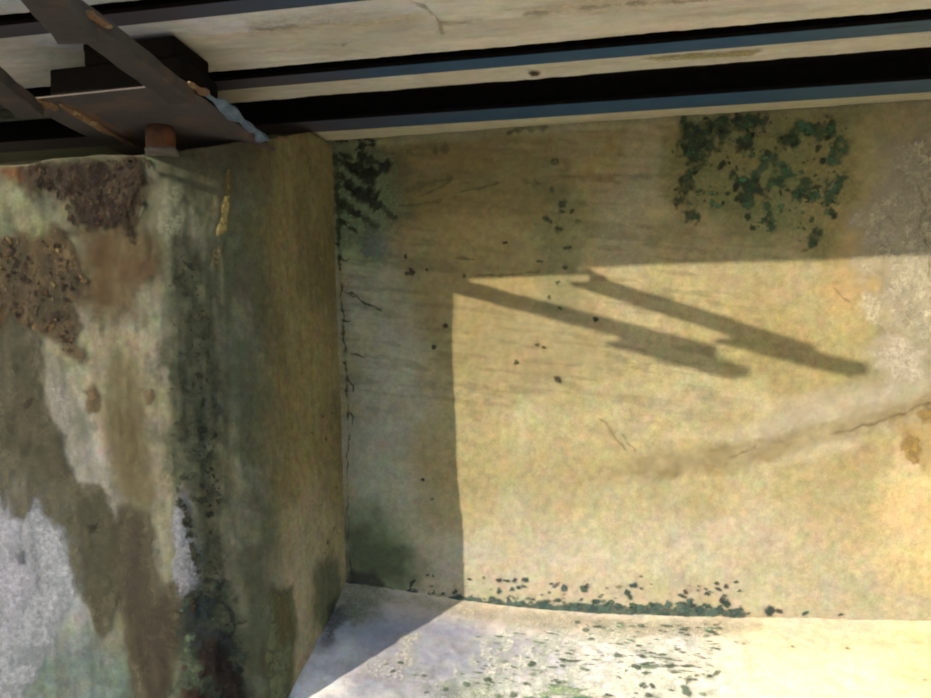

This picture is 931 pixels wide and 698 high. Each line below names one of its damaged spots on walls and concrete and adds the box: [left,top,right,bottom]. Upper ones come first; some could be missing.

mould [332,138,411,261]
mould [670,111,855,255]
crack [332,142,382,470]
water stain [0,180,253,698]
crack [830,402,929,434]
water stain [326,572,749,698]